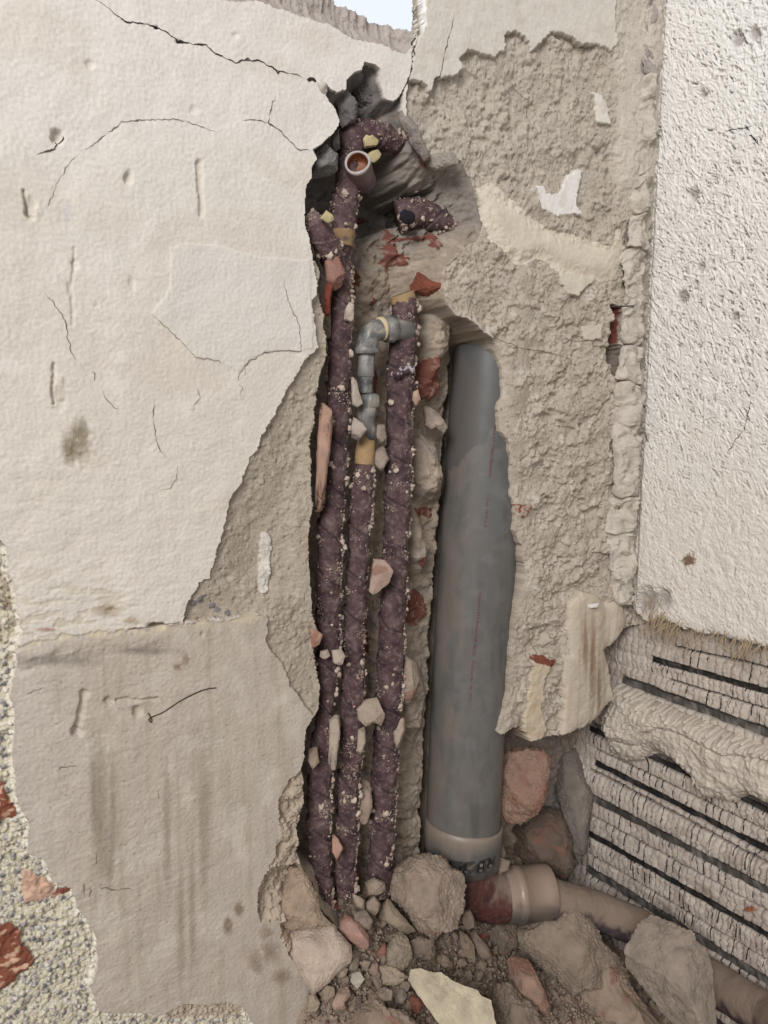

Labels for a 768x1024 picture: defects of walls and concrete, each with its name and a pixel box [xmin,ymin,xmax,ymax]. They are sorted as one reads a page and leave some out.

crack [97,0,316,82]
crack [37,118,212,205]
crack [245,101,311,151]
flaking render [183,0,665,965]
flaking render [0,540,254,1024]